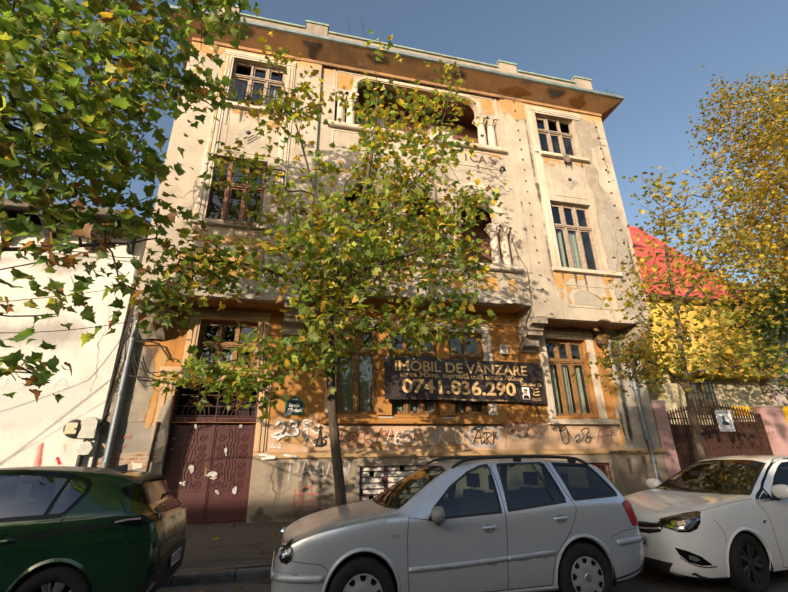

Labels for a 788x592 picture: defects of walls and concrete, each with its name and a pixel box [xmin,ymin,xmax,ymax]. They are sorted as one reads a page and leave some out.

water stain [303,41,322,60]
peeling [481,99,525,120]
water stain [539,89,565,100]
peeling [553,271,584,303]
crack [87,307,133,444]
flaking render [95,347,172,470]